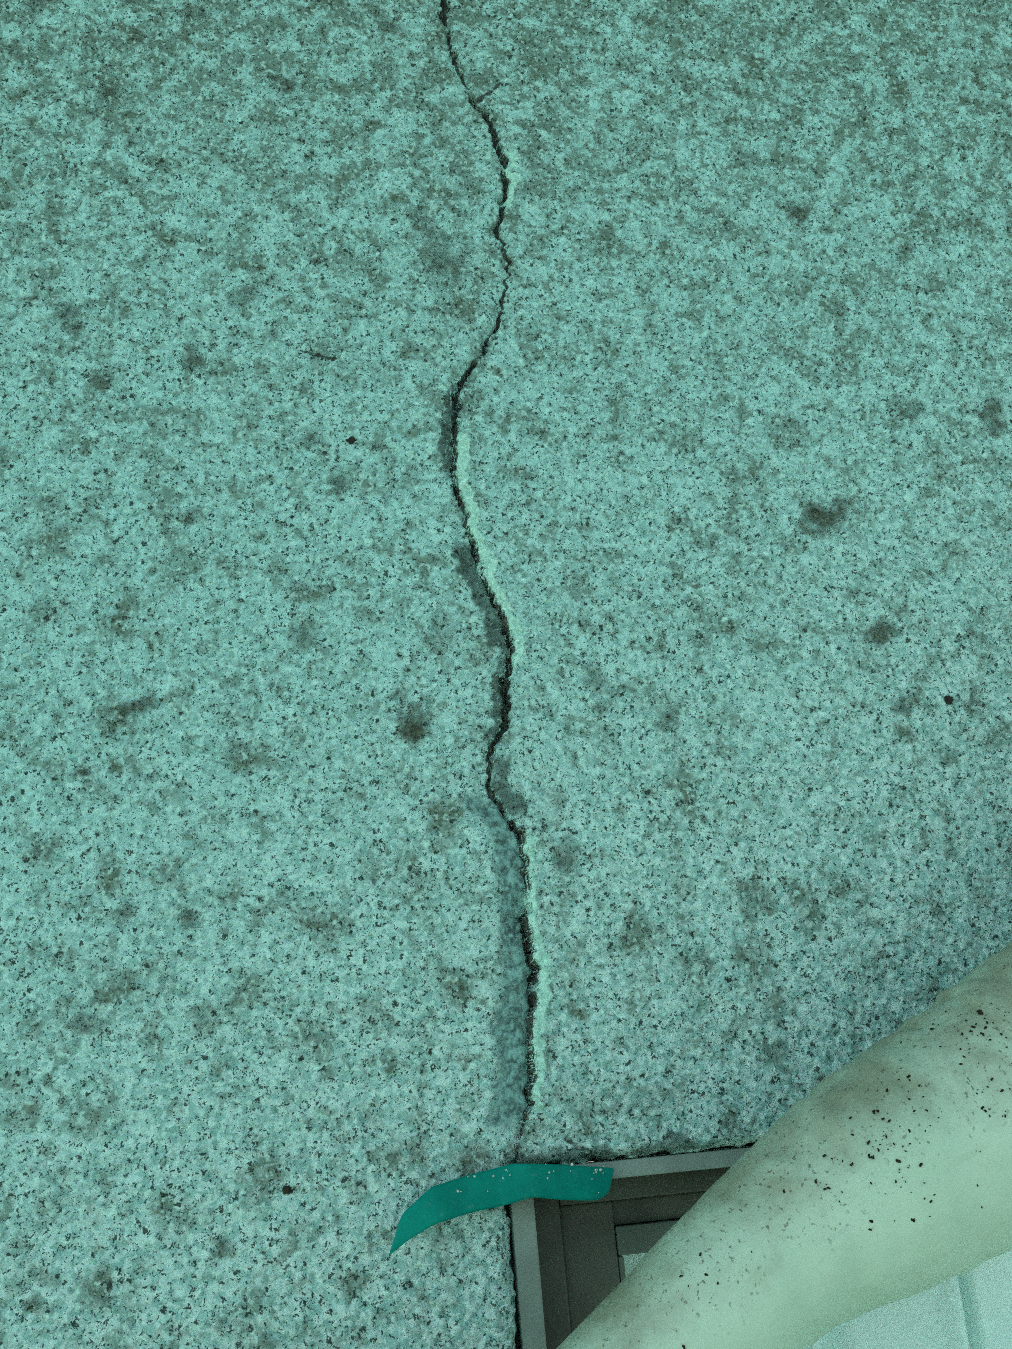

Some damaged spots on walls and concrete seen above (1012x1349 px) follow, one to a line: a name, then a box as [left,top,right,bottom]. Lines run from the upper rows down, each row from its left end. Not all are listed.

crack [437,0,602,1163]